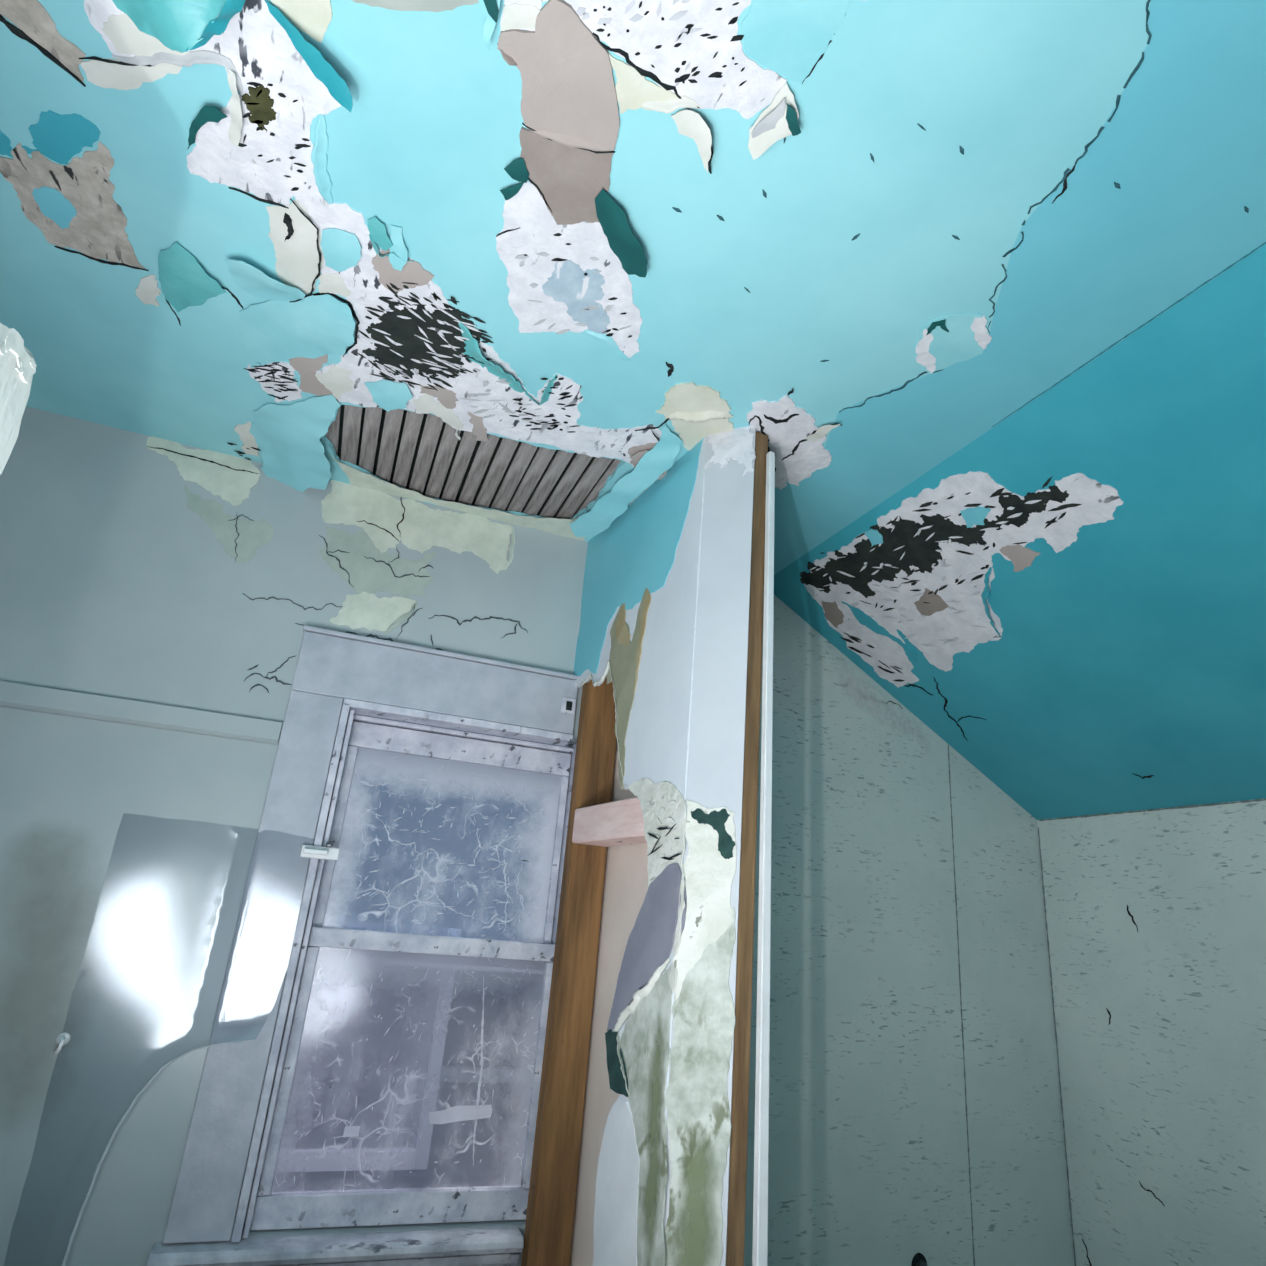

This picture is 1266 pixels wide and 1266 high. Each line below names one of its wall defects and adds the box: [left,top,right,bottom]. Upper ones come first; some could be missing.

crack [988,0,1152,333]
peeling [0,0,842,634]
crack [839,369,944,413]
peeling [915,313,992,373]
peeling [855,488,1012,539]
peeling [1044,503,1082,529]
crack [244,535,528,651]
crack [244,656,295,693]
crack [833,677,986,741]
peeling [579,587,737,1266]
water stain [644,1030,661,1247]
water stain [677,1145,710,1266]